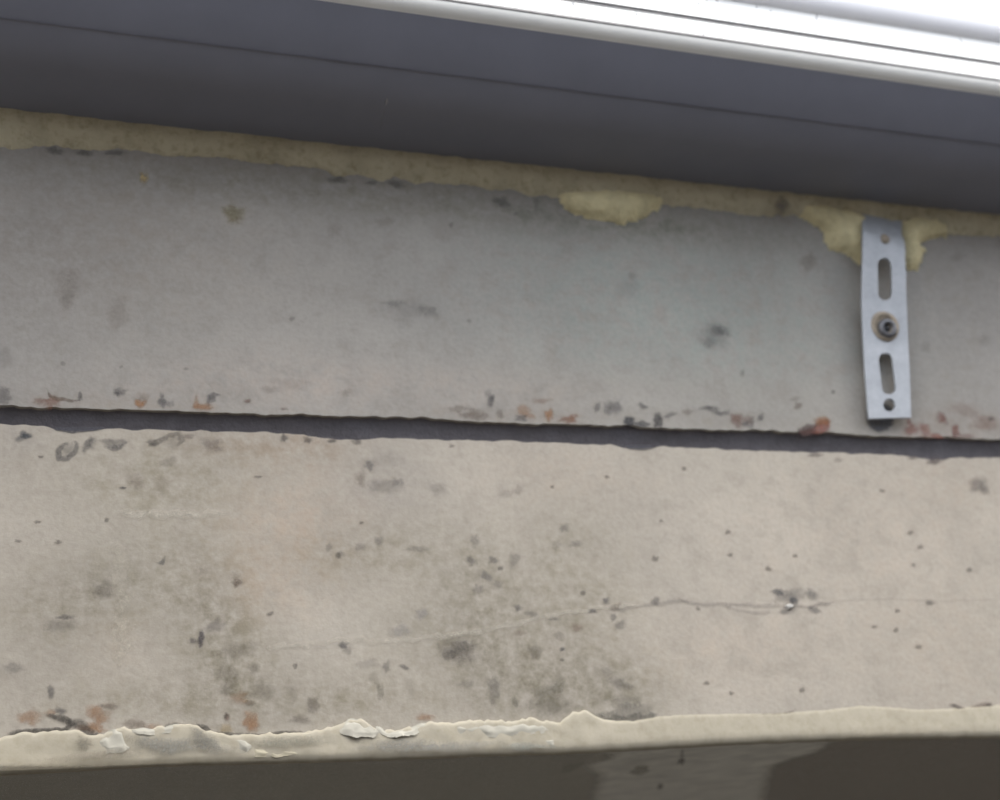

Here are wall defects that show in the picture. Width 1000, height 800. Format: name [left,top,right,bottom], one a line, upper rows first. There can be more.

corrosion [799,419,830,436]
flaking render [0,705,1000,776]